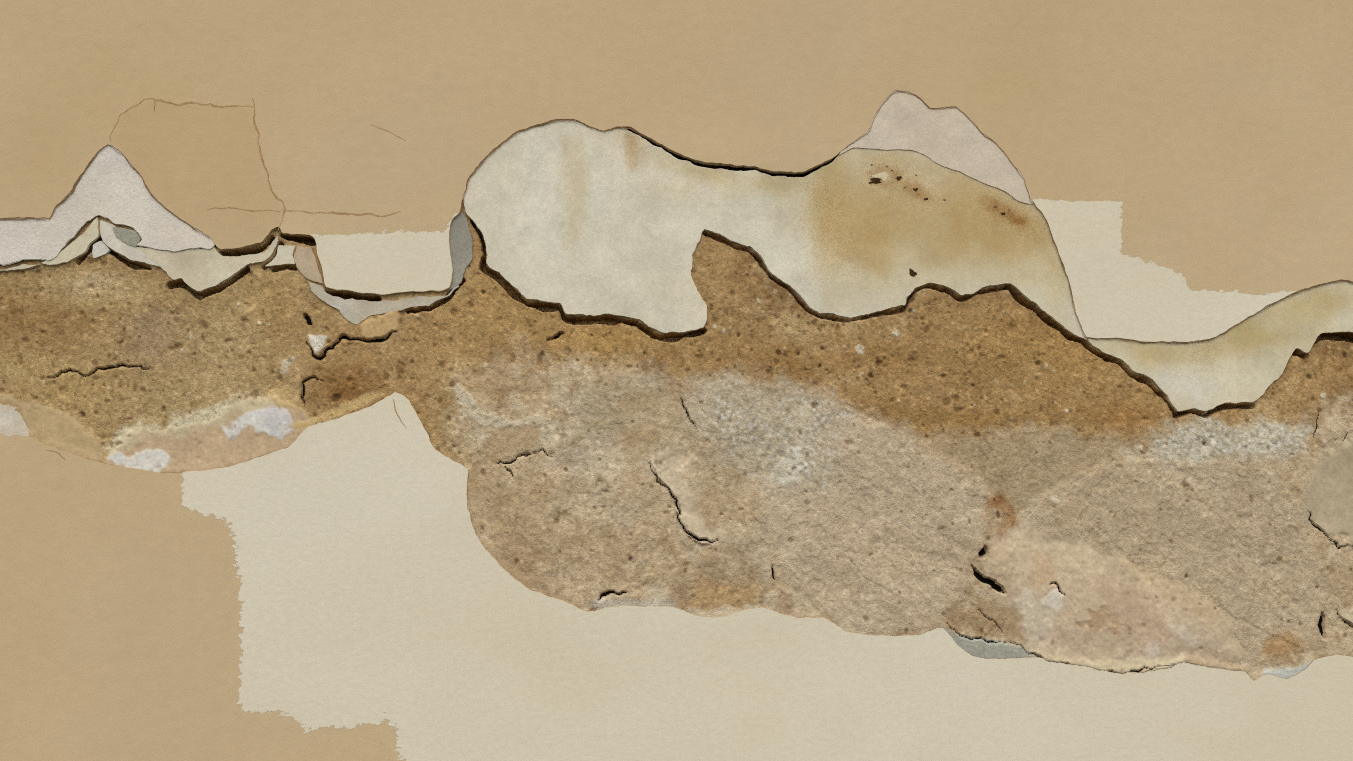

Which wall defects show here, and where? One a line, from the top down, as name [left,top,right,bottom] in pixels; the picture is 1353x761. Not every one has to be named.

crack [110,98,400,230]
crack [54,365,146,378]
spalling [0,91,1353,681]
crack [649,463,718,543]
crack [945,548,1068,664]